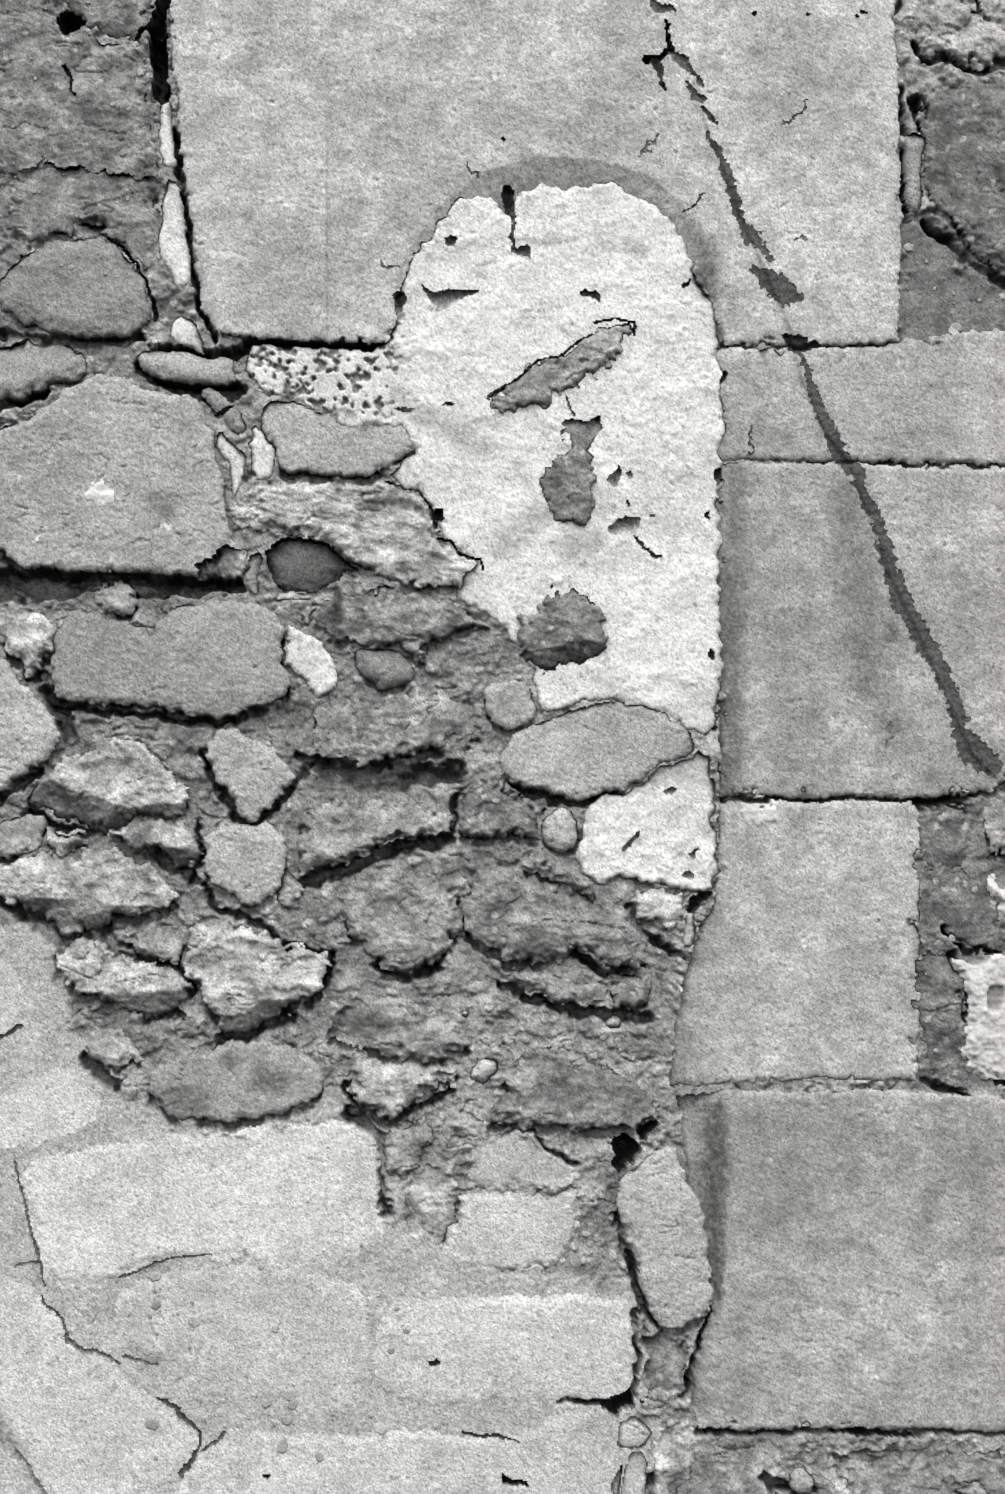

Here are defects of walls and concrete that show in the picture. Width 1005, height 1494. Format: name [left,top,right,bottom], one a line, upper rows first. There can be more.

spalling [393,292,407,313]
spalling [421,285,478,312]
spalling [580,290,600,302]
crack [639,0,1004,776]
spalling [607,467,655,535]
spalling [433,510,444,522]
crack [634,536,662,559]
spalling [622,830,639,851]
spalling [682,847,711,913]